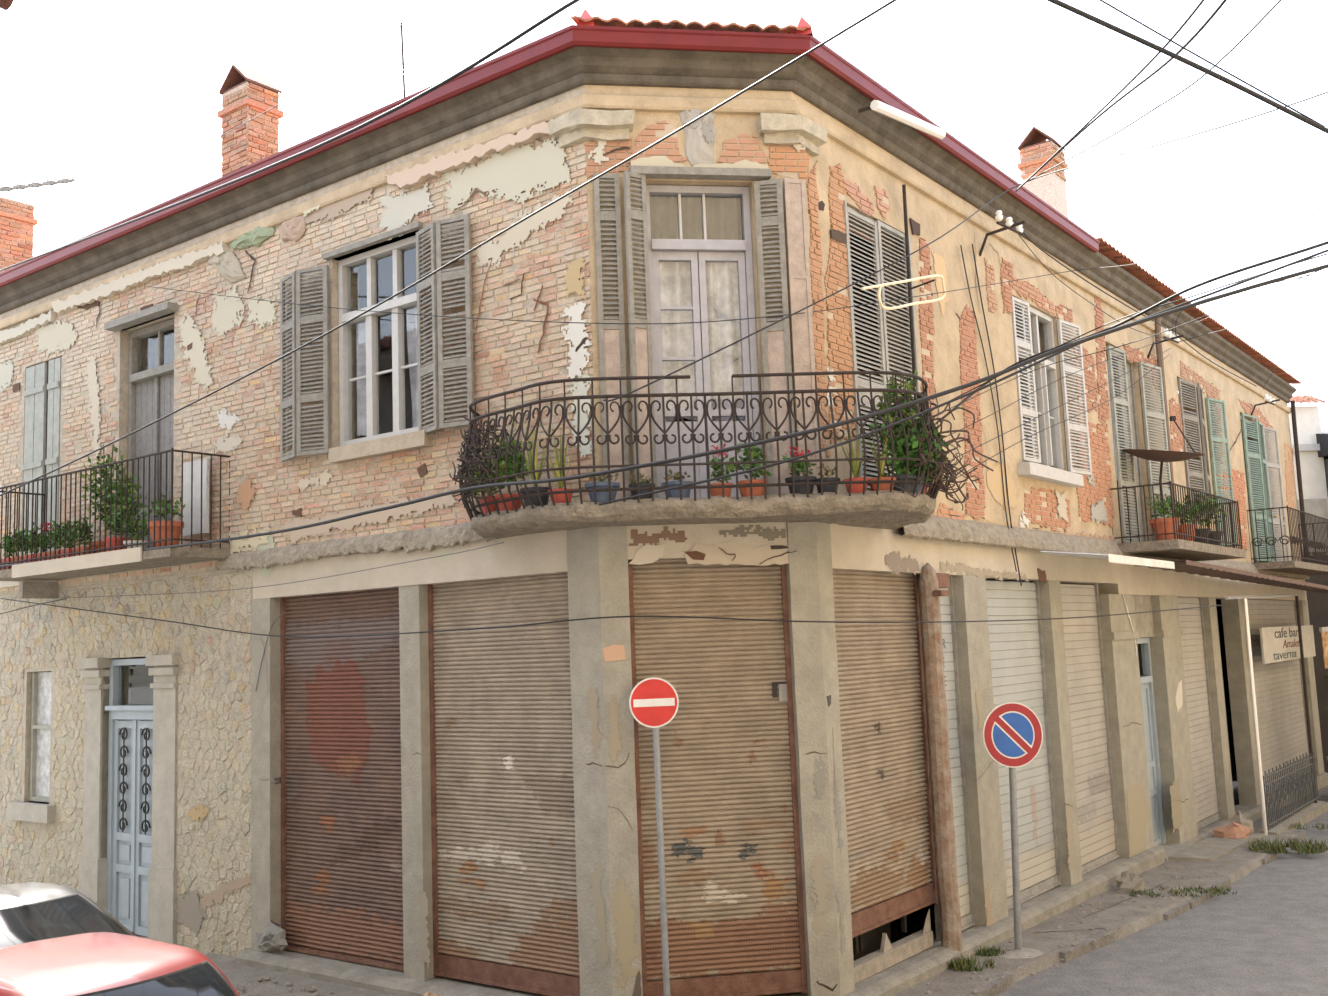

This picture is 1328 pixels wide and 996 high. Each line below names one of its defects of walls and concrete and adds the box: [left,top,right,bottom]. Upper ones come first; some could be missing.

spalling [919,238,935,416]
spalling [931,257,1115,541]
spalling [1123,343,1184,452]
spalling [1180,360,1247,550]
spalling [1238,399,1295,512]
crack [720,548,796,565]
rust [304,637,374,785]
rust [285,867,404,964]
rust [642,805,801,980]